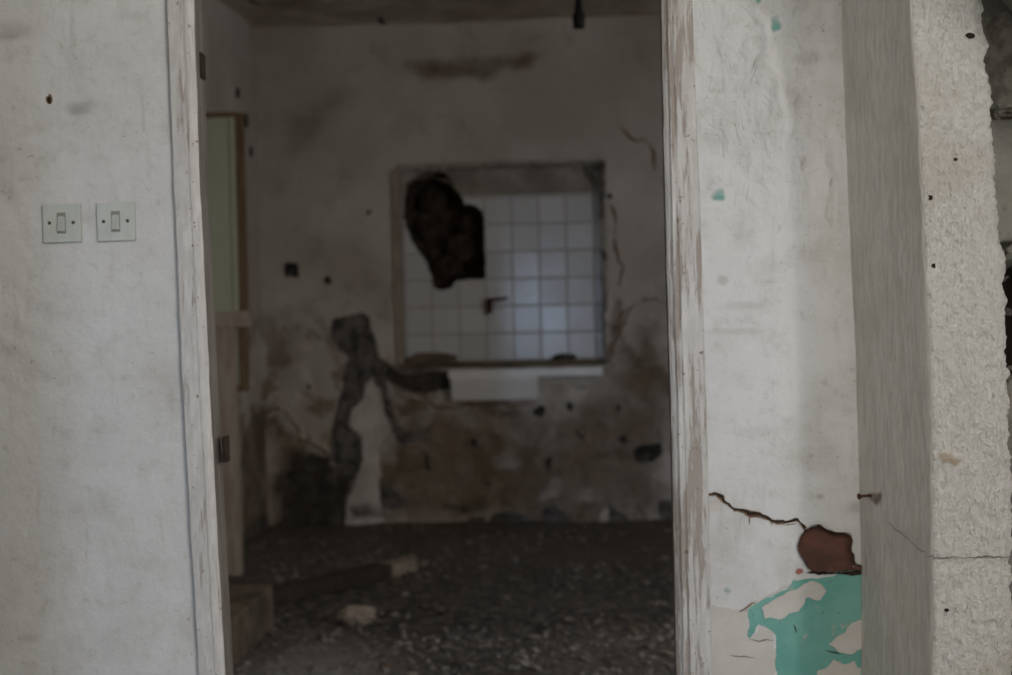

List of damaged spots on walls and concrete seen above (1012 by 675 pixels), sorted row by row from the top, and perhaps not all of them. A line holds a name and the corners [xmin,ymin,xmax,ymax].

spalling [965,11,1012,110]
spalling [403,173,486,290]
spalling [279,312,546,525]
damp [384,366,447,392]
damp [398,340,654,512]
crack [709,492,806,530]
peeling [711,523,862,675]